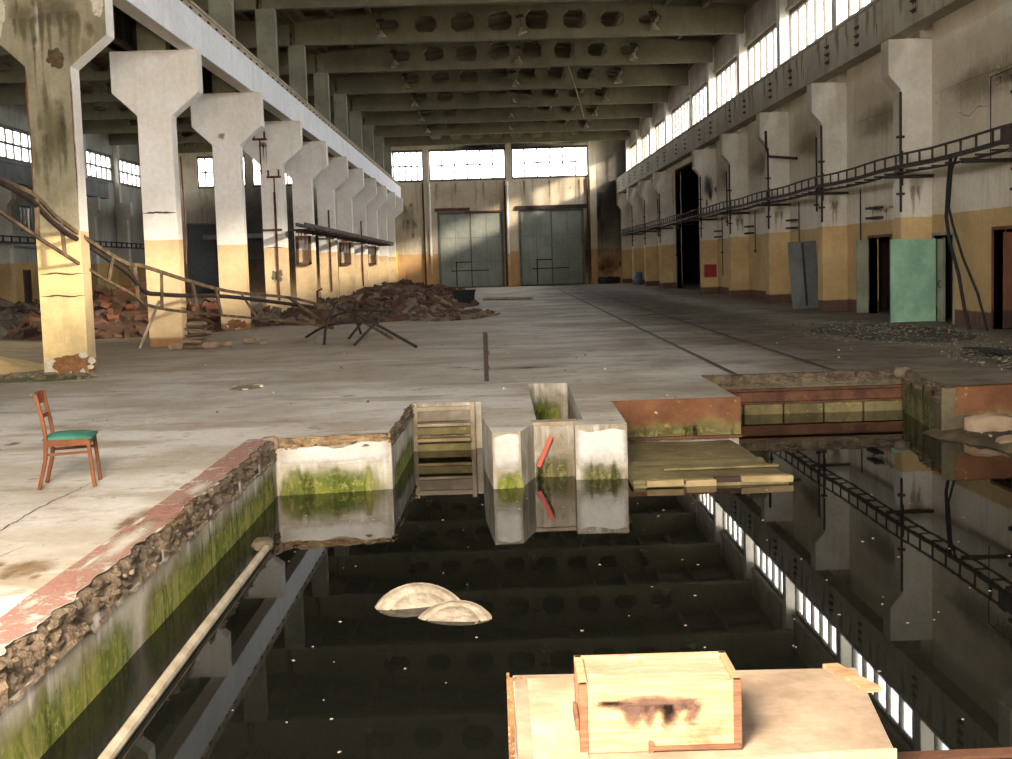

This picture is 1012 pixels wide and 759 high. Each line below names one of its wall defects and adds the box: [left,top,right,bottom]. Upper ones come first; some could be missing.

water stain [13,0,92,49]
spalling [46,47,64,69]
water stain [35,87,67,169]
spalling [43,352,96,373]
water stain [506,474,524,489]
water stain [590,465,620,480]
crack [0,473,112,556]
water stain [120,499,190,530]
water stain [0,563,44,578]
spalling [0,402,520,716]
water stain [93,613,102,645]